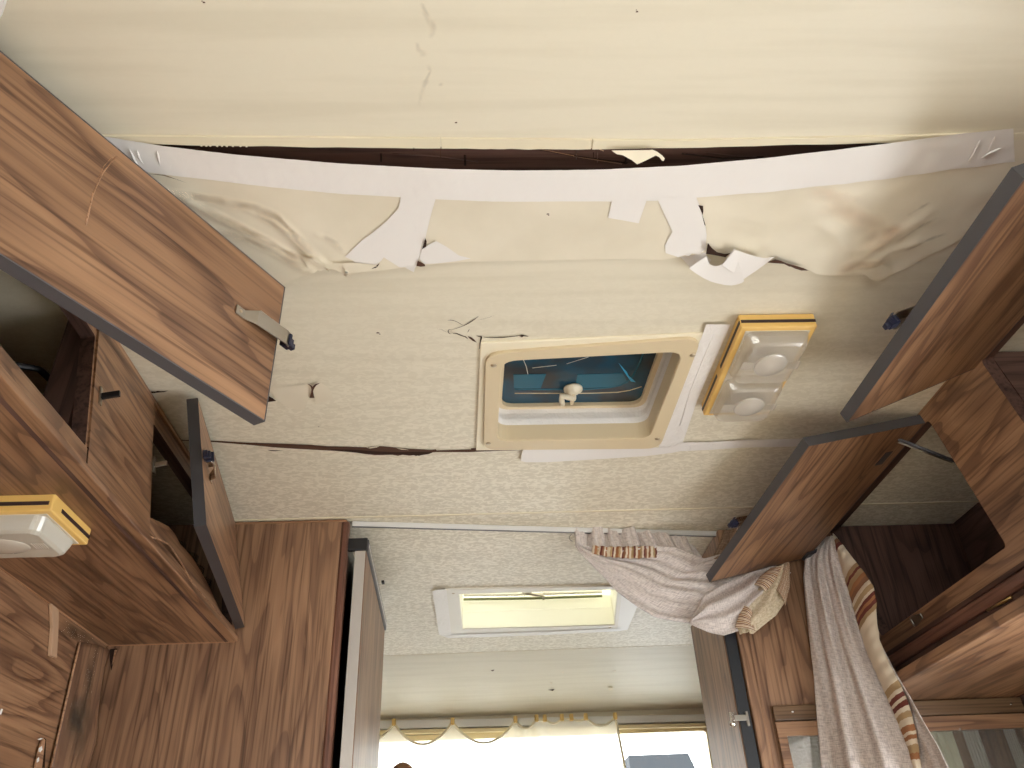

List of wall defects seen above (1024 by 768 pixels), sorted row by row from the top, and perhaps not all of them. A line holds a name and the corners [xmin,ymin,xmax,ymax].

peeling [611,150,665,164]
crack [445,317,528,349]
crack [182,440,515,458]